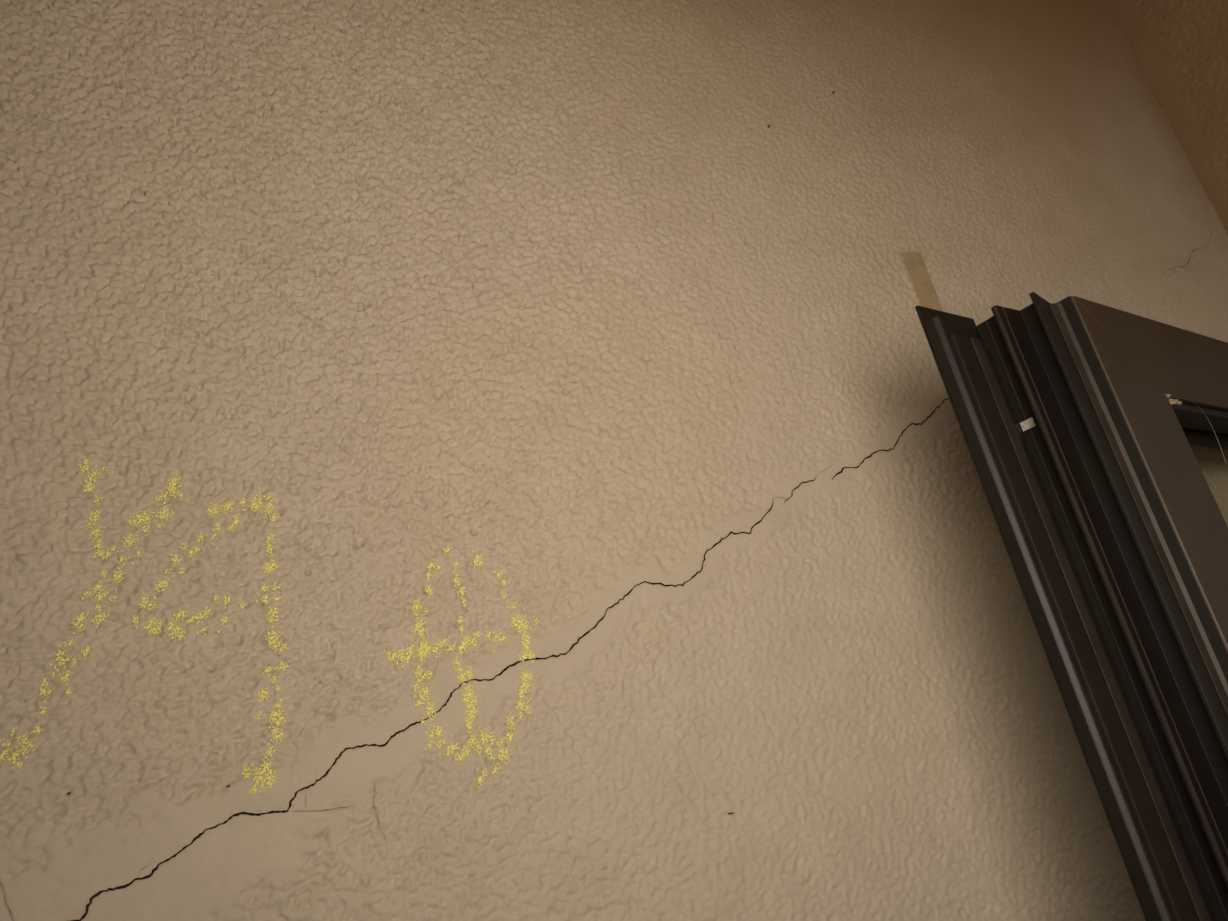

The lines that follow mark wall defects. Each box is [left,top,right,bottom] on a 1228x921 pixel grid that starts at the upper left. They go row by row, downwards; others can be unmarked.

crack [0,882,14,921]
crack [71,398,949,921]